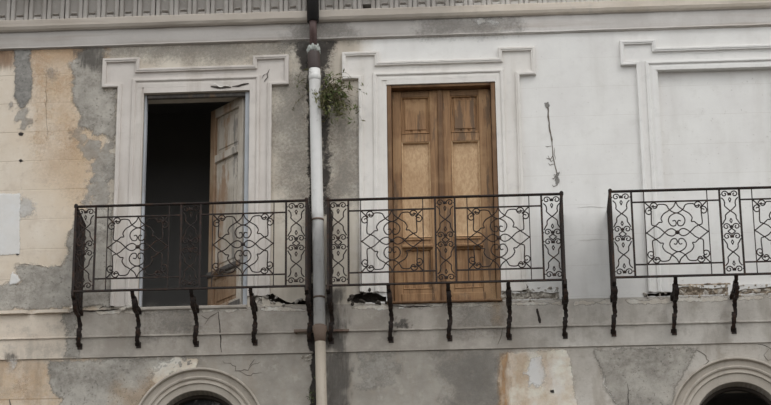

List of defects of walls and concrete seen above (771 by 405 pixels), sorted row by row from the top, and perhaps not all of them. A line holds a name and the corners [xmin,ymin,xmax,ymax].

flaking render [0,47,198,405]
spalling [254,294,306,308]
spalling [501,285,559,302]
spalling [643,283,771,299]
crack [201,311,258,376]